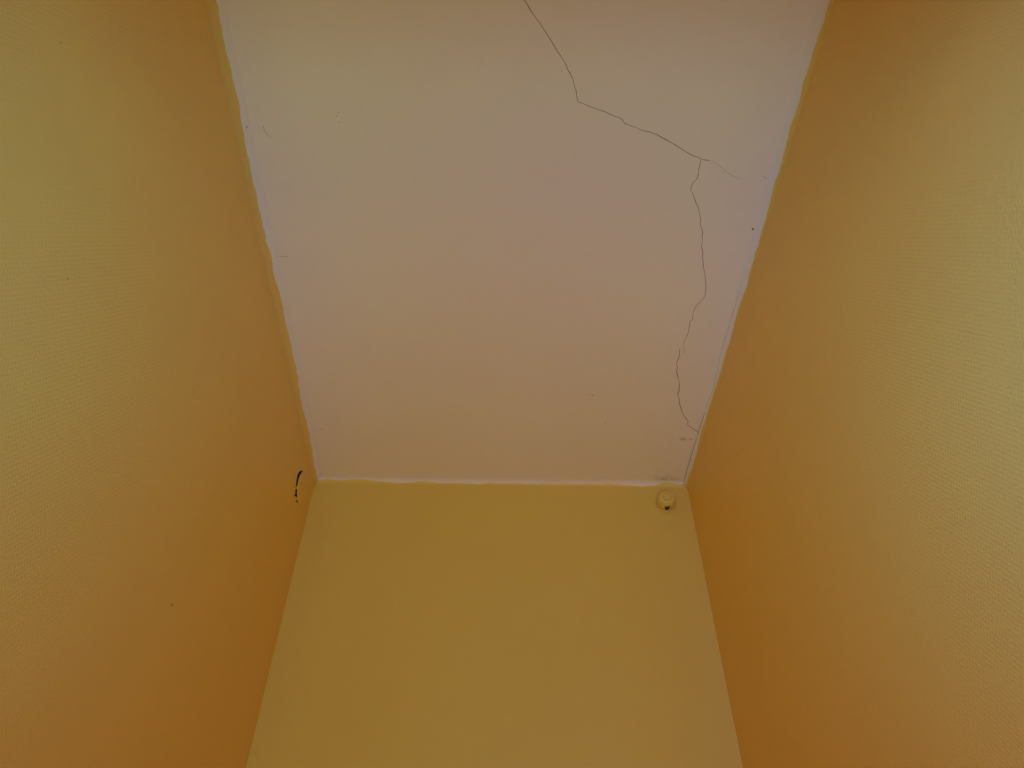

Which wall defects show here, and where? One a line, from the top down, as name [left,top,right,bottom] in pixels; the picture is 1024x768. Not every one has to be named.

crack [524,0,766,485]